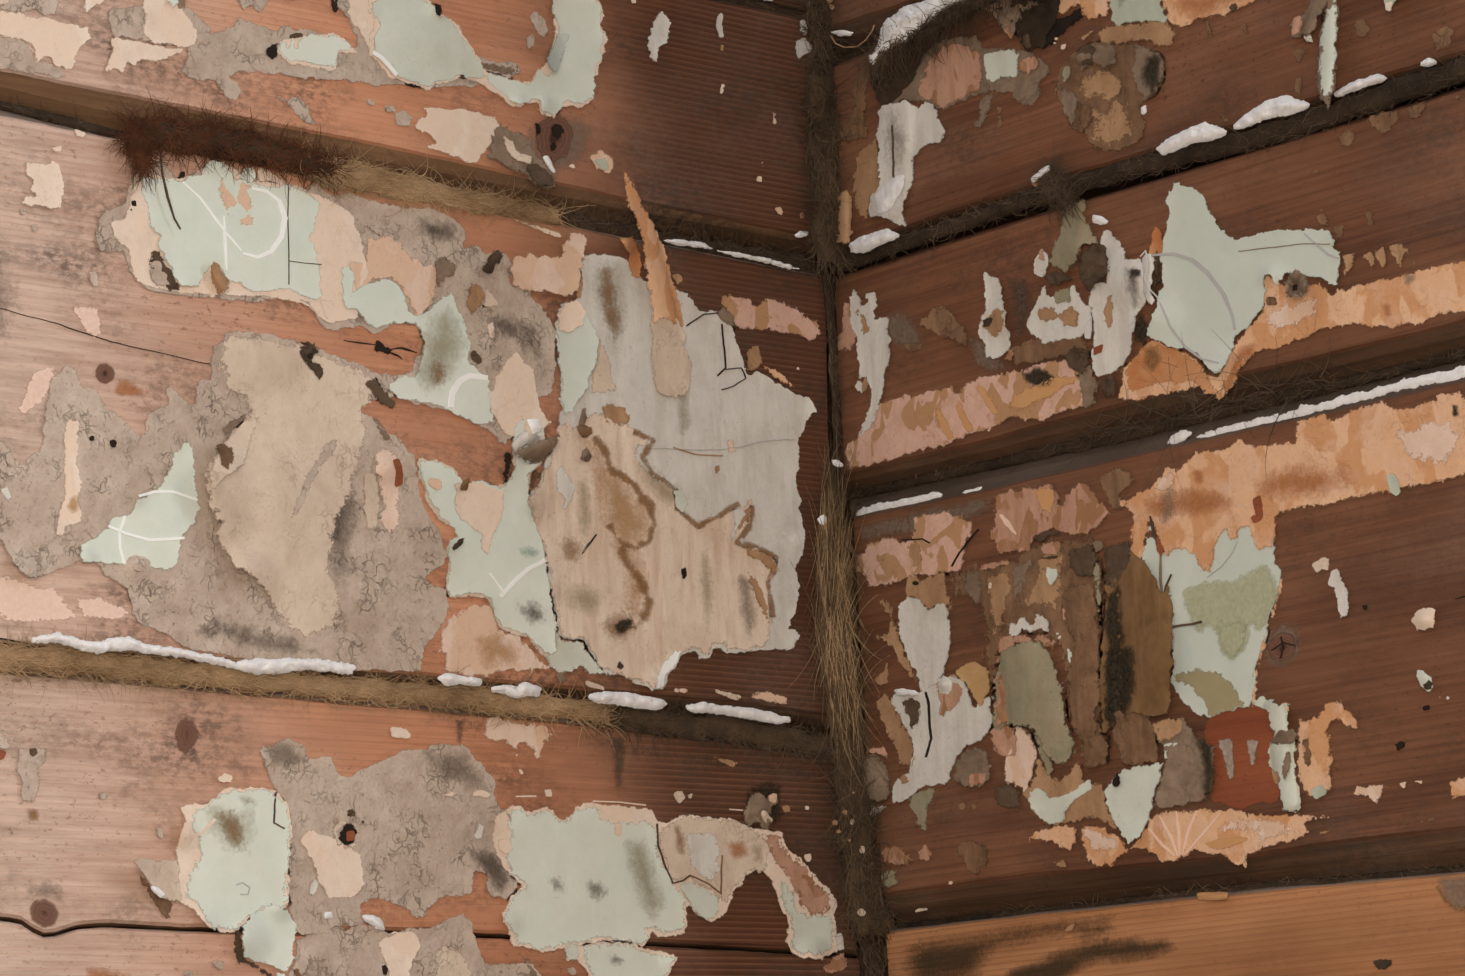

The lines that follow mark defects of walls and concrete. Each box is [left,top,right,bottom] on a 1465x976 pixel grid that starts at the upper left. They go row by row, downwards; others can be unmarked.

peeling [569,150,614,174]
peeling [19,146,64,231]
peeling [1033,249,1049,277]
peeling [1343,242,1416,272]
crack [0,308,211,365]
peeling [978,272,1014,361]
peeling [209,417,259,488]
peeling [1312,557,1349,618]
peeling [715,689,787,704]
peeling [674,791,692,803]
peeling [1354,781,1422,804]
damp [913,925,1168,976]